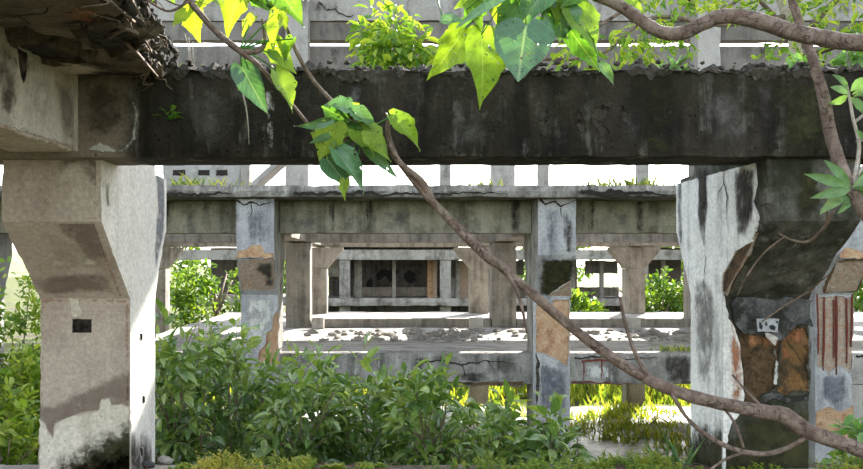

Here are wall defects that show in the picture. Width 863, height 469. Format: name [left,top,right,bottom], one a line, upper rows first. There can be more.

spalling [4,0,180,86]
water stain [697,169,707,231]
water stain [735,169,753,233]
spalling [236,244,277,291]
spalling [723,232,759,296]
spalling [257,309,280,367]
crack [425,359,518,374]
spalling [439,281,572,406]
spalling [738,246,863,404]
spalling [815,405,854,437]